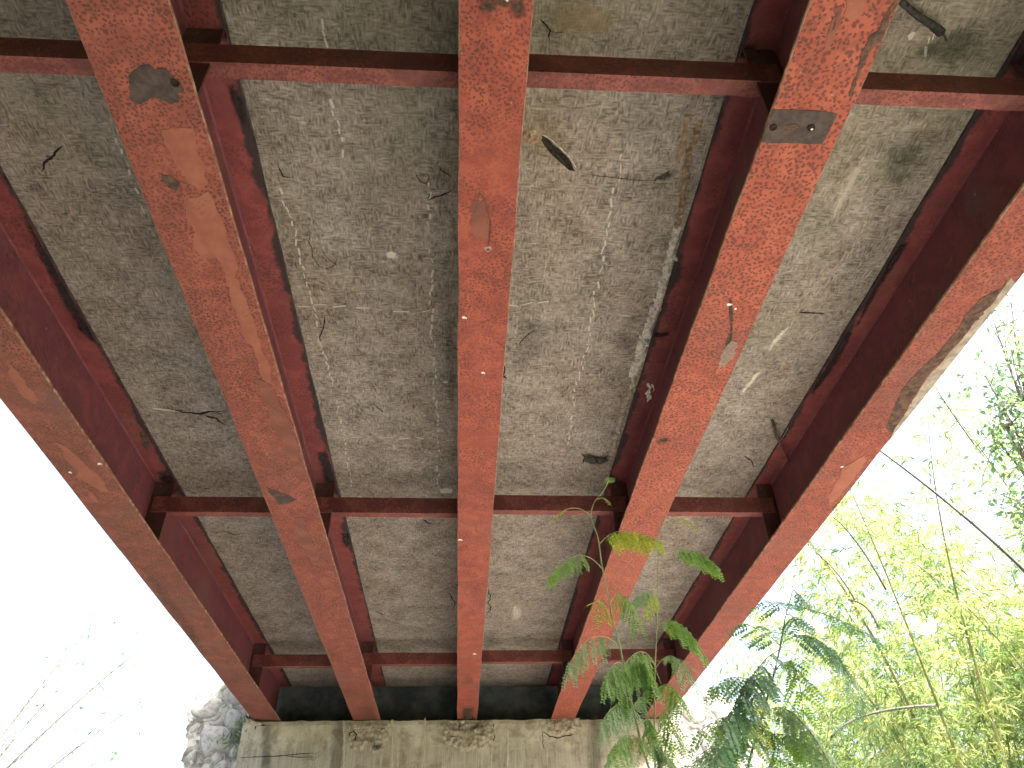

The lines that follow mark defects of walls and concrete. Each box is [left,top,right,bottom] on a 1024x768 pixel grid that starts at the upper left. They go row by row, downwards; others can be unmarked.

rust [480,0,524,18]
crack [540,19,563,41]
peeling [129,64,184,105]
crack [41,146,62,172]
peeling [160,127,271,384]
crack [167,408,229,426]
spalling [345,723,389,753]
spalling [438,720,494,752]